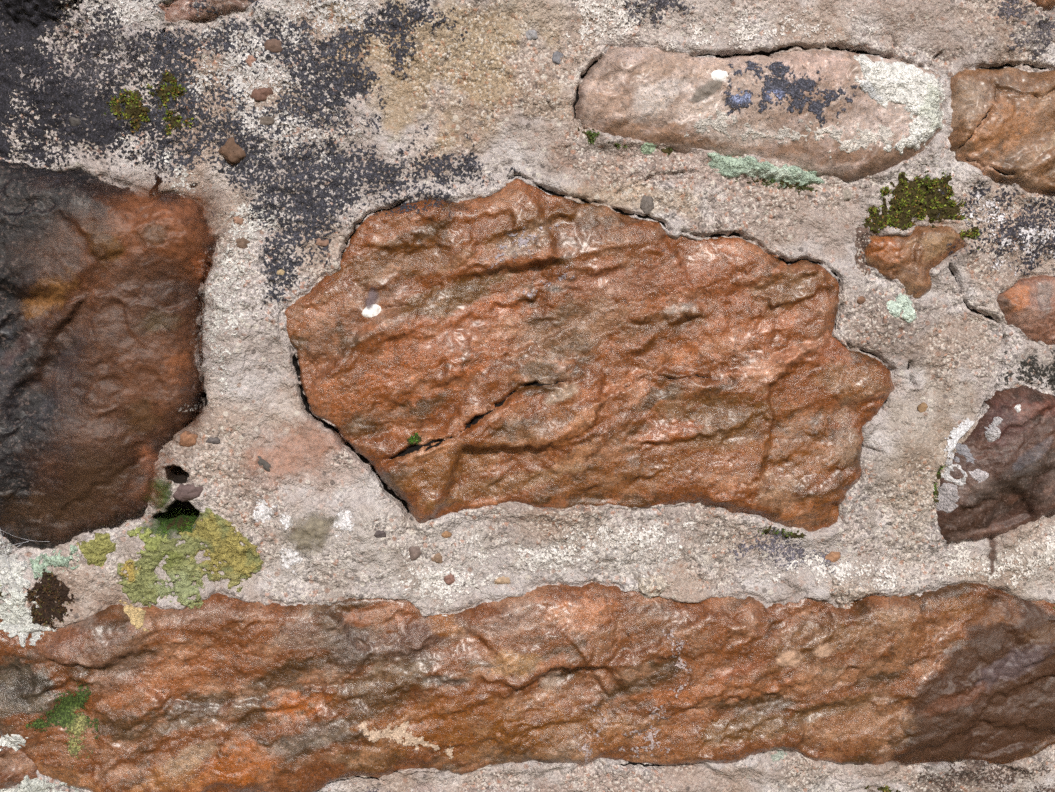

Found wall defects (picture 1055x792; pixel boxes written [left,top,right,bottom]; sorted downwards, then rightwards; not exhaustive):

crack [292,348,559,513]